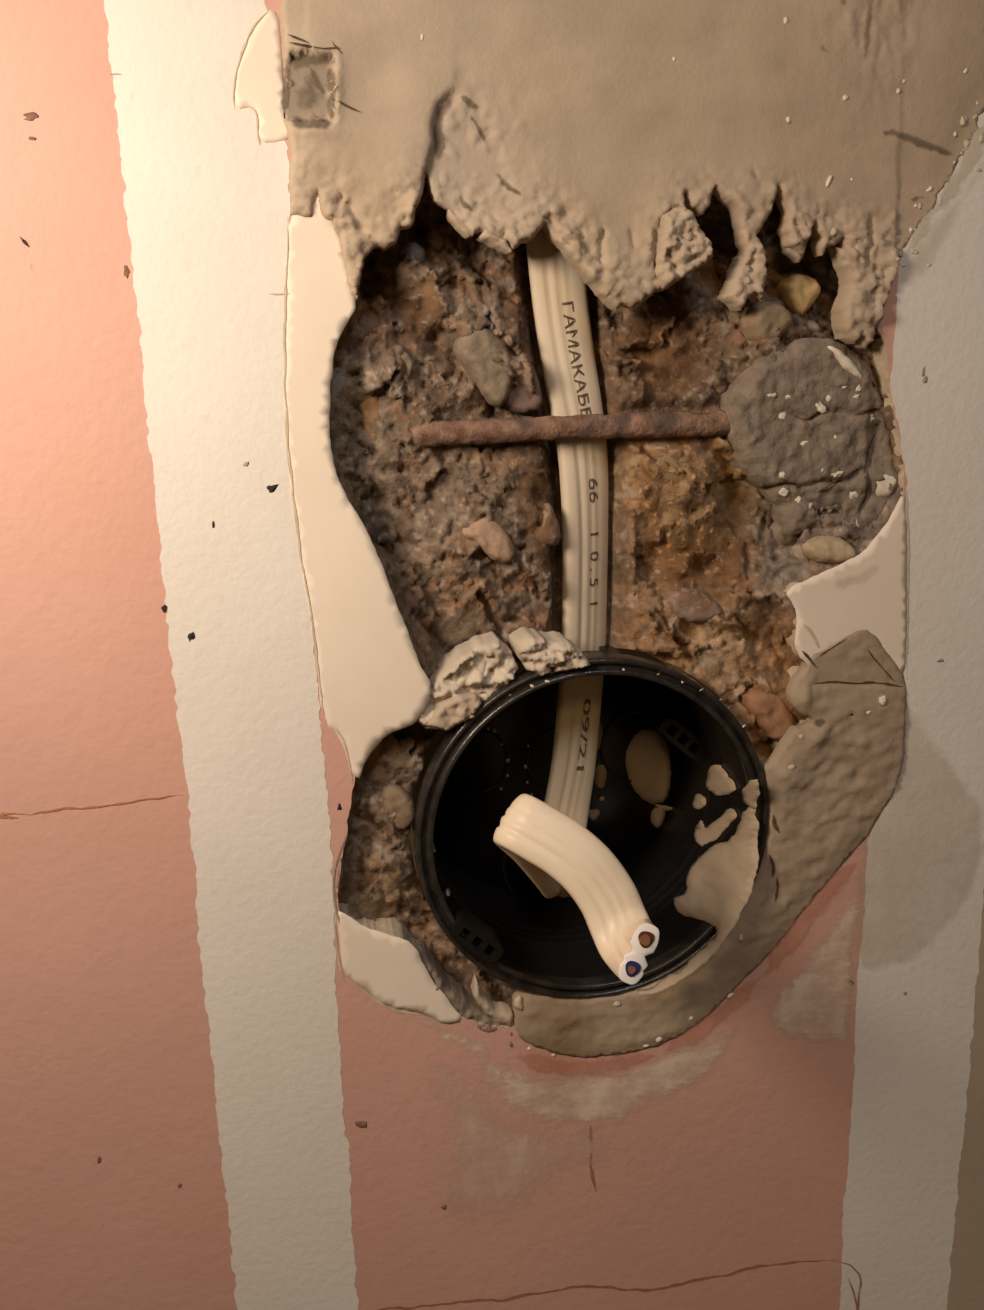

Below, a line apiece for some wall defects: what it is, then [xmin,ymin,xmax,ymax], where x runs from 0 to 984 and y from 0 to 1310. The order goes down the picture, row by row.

peeling [828,346,862,379]
spalling [410,410,731,447]
peeling [268,193,431,781]
peeling [787,474,910,677]
crack [0,795,174,819]
peeling [333,911,461,1024]
peeling [470,973,514,1027]
crack [378,1260,862,1310]